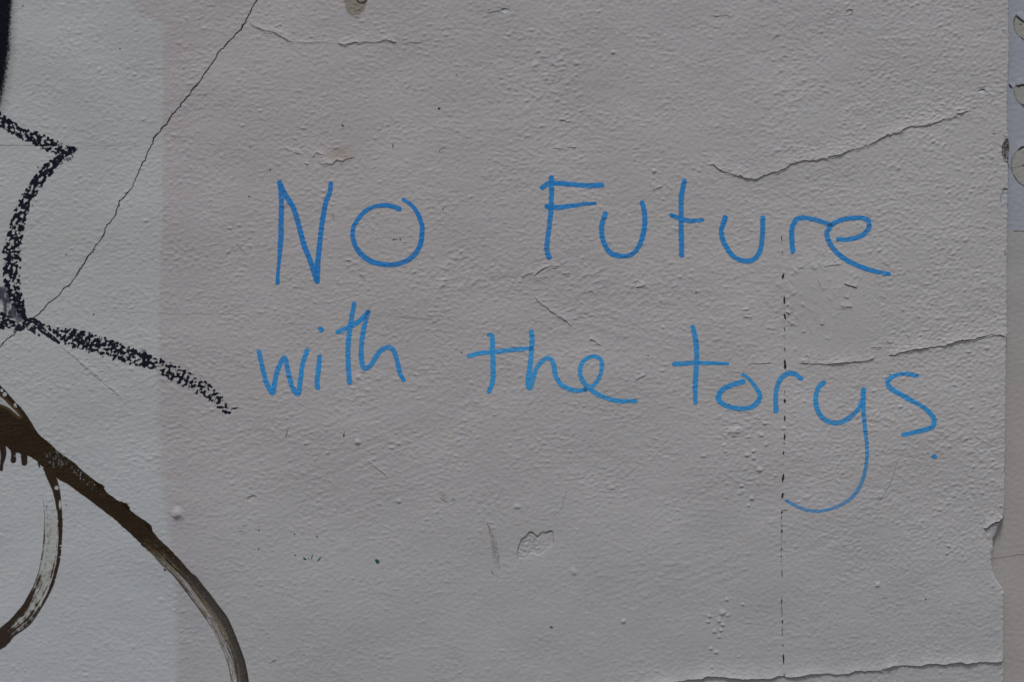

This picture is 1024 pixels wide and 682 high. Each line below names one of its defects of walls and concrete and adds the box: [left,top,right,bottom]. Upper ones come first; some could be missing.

crack [0,0,422,347]
crack [702,93,978,181]
crack [747,236,1008,369]